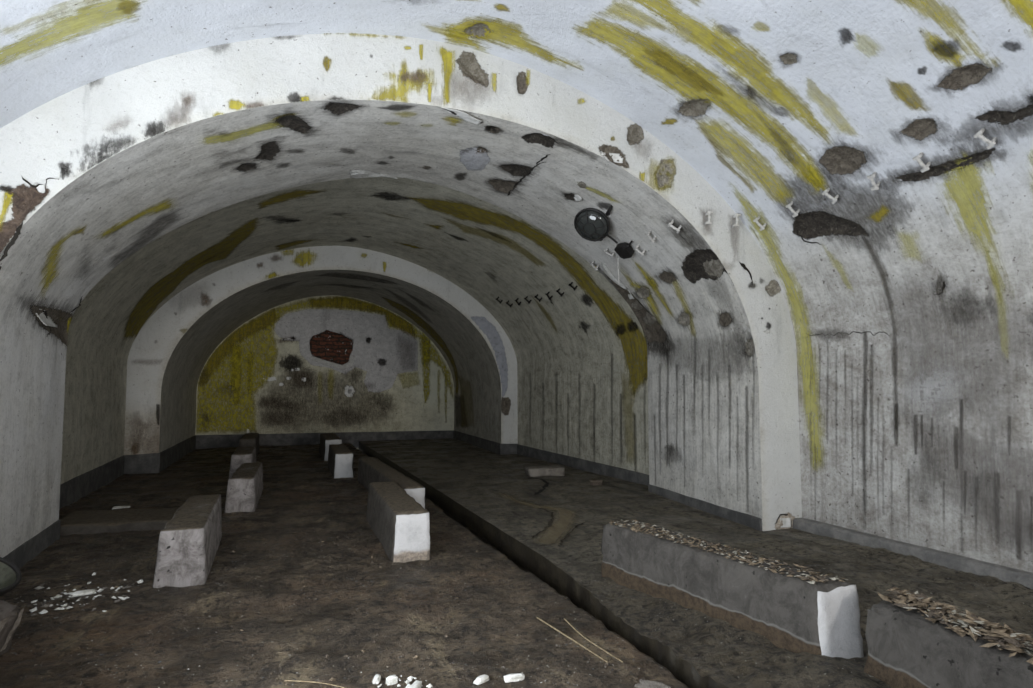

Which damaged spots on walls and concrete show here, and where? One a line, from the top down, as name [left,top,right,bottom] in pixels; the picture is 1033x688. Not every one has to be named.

damp [607,4,665,29]
damp [647,51,722,95]
damp [708,139,752,190]
flaking render [784,95,1033,245]
flaking render [0,175,50,270]
flaking render [659,221,734,285]
flaking render [24,297,82,346]
flaking render [309,330,355,370]
flaking render [601,264,674,356]
damp [866,241,898,445]
damp [264,355,389,425]
damp [863,333,872,479]